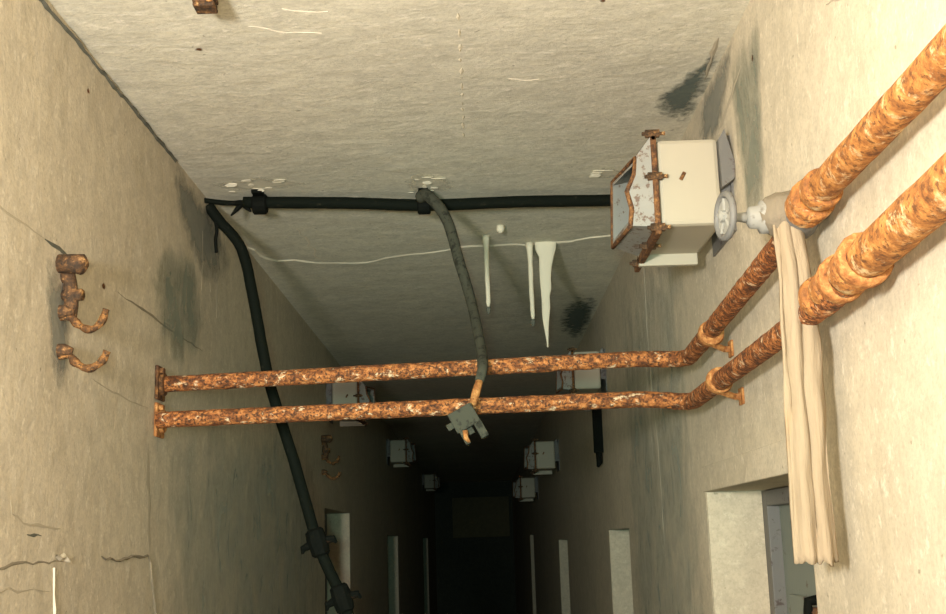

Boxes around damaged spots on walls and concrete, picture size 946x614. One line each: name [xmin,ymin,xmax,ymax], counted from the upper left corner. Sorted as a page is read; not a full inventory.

leakage [661,38,760,197]
leakage [164,184,221,349]
crack [10,501,60,537]
crack [0,560,64,594]
crack [101,554,157,614]